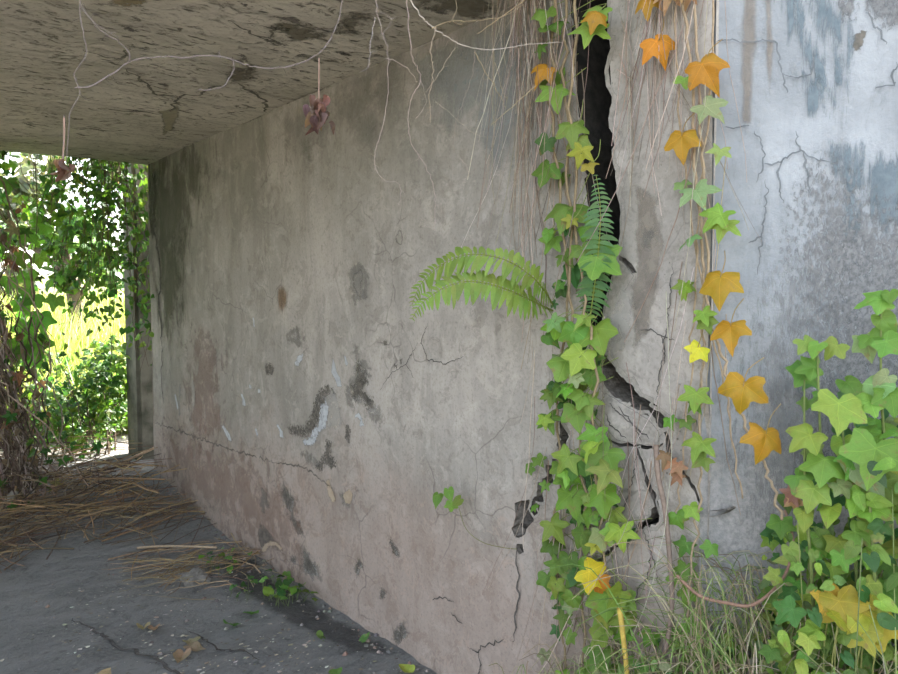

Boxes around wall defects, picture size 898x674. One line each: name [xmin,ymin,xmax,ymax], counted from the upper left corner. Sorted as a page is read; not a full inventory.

crack [716,38,815,93]
leakage [787,0,898,116]
crack [868,13,898,88]
crack [726,125,829,275]
crack [149,168,330,487]
crack [380,323,464,390]
crack [567,0,736,603]
crack [528,393,573,519]
spalling [511,500,538,554]
crack [71,618,181,674]
crack [189,631,259,660]
crack [472,548,520,674]